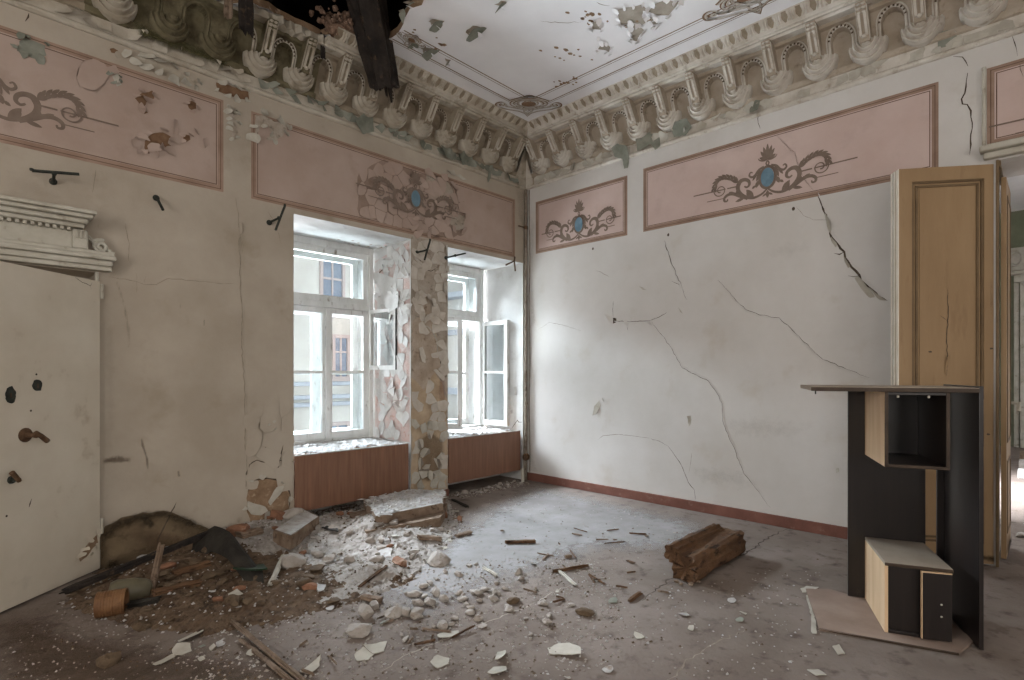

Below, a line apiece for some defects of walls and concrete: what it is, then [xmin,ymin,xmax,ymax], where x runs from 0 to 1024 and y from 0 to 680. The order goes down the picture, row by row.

peeling [134,119,199,158]
peeling [19,0,358,141]
peeling [466,26,487,42]
peeling [539,0,684,61]
peeling [627,13,1024,153]
crack [953,56,973,155]
crack [781,140,890,301]
crack [236,198,283,489]
peeling [337,160,467,517]
crack [600,241,772,514]
crack [716,280,869,380]
peeling [242,395,294,521]